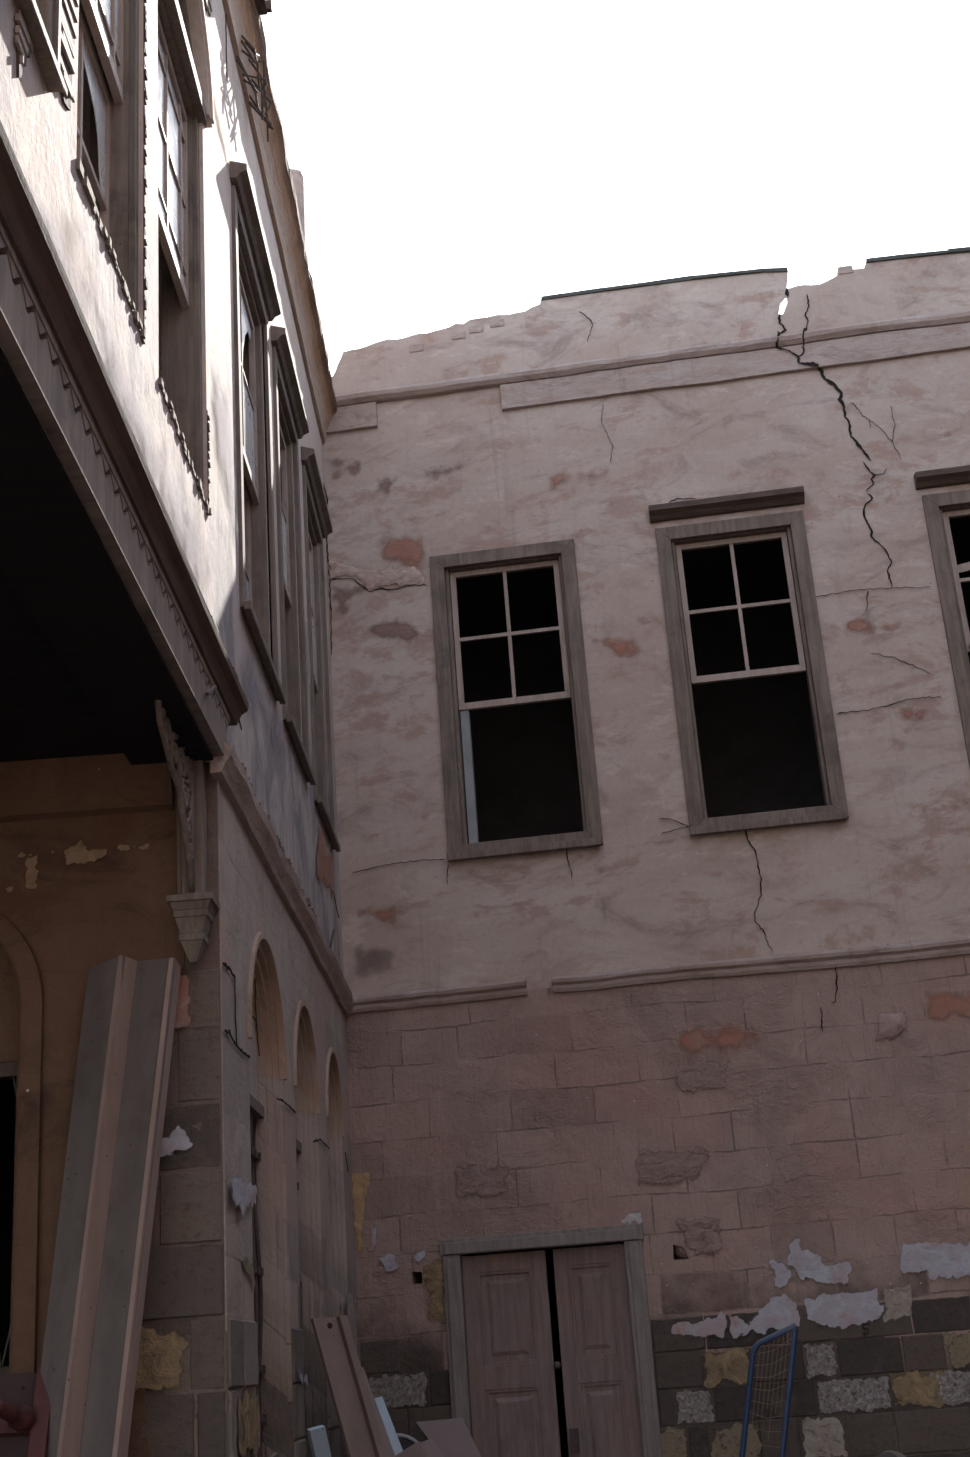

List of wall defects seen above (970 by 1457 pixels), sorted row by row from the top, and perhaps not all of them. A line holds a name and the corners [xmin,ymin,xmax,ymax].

crack [775,288,929,609]
crack [745,831,773,951]
spalling [135,1326,190,1391]
spalling [660,1238,970,1457]
spalling [238,1390,261,1457]